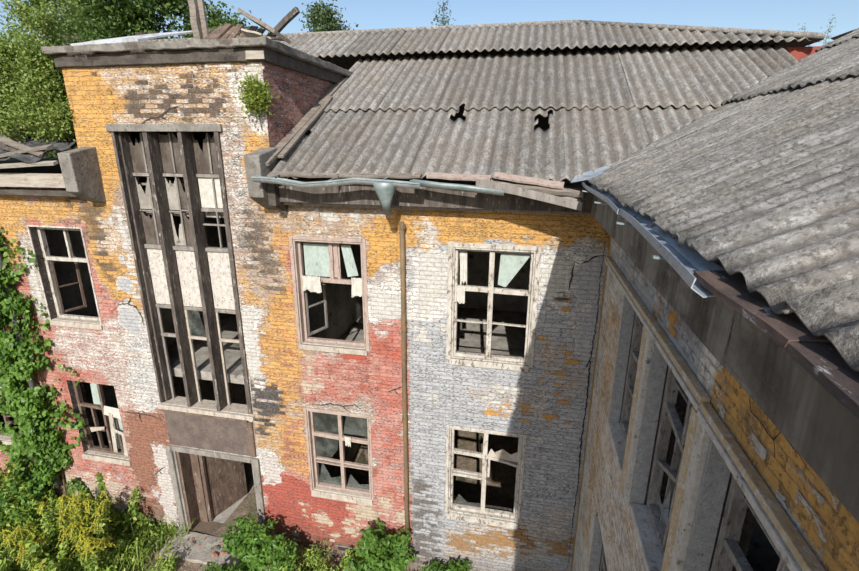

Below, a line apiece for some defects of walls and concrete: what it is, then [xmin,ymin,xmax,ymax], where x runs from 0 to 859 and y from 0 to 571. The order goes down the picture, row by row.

spalling [109,73,235,124]
peeling [228,63,265,86]
spalling [99,205,145,339]
peeling [367,226,448,345]
peeling [242,306,271,382]
peeling [480,242,608,433]
water stain [250,380,286,436]
crack [567,235,607,568]
spalling [63,410,181,531]
peeling [260,455,282,486]
peeling [298,497,410,553]
peeling [775,463,839,562]